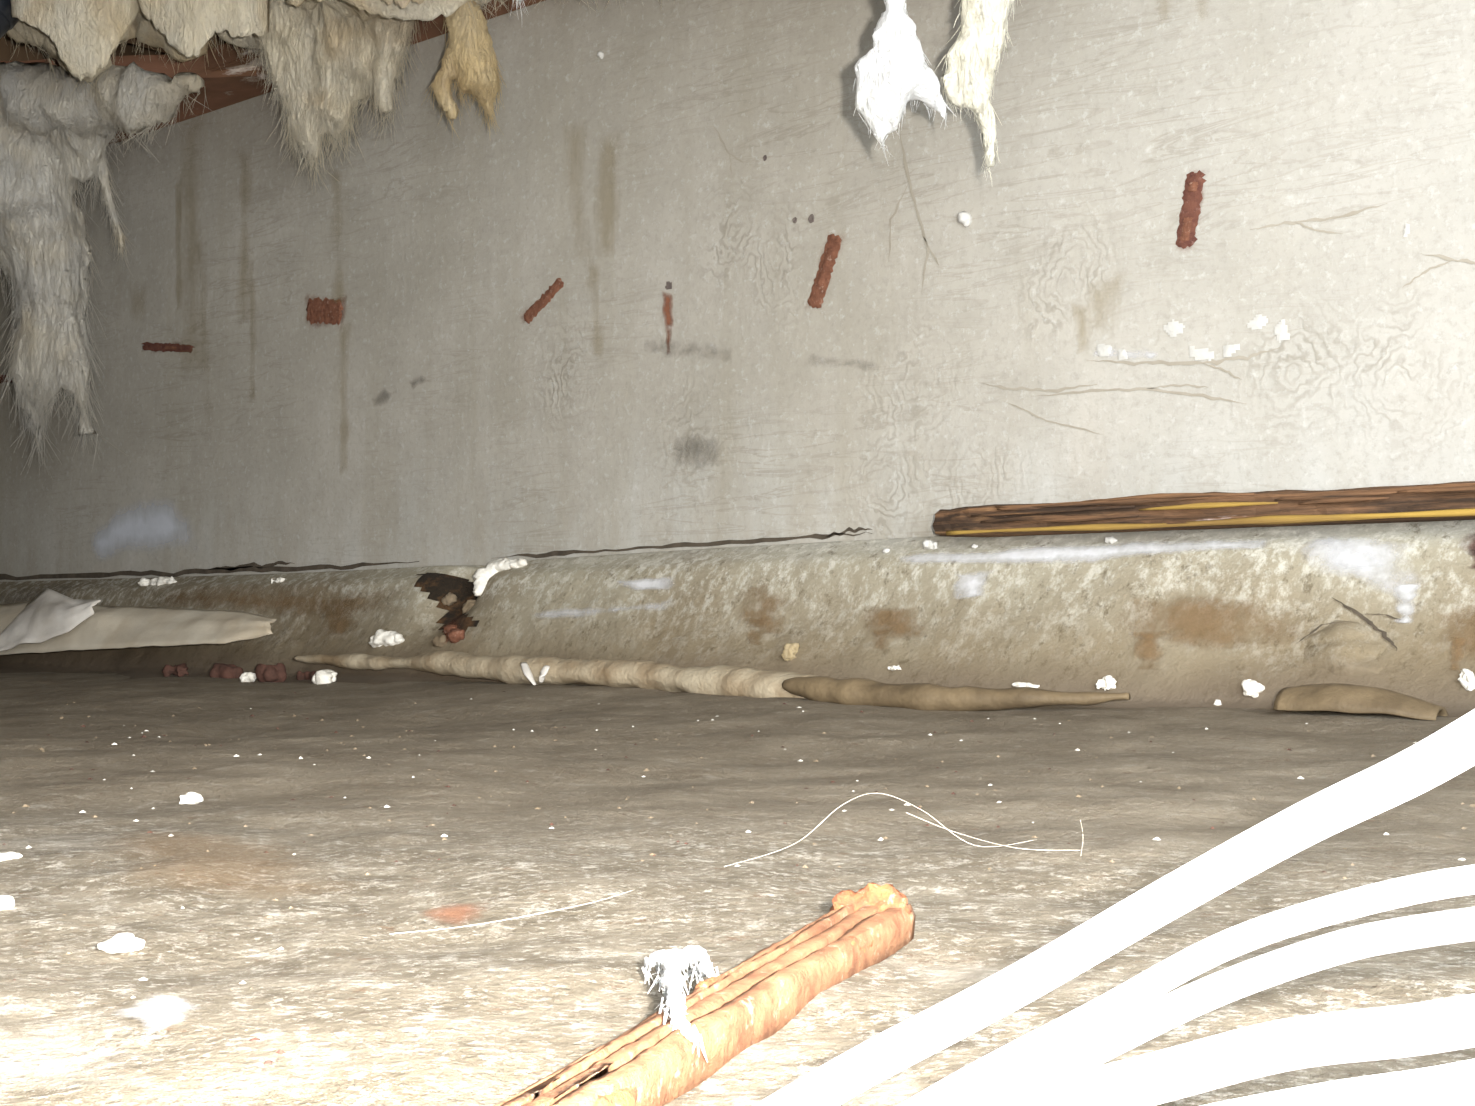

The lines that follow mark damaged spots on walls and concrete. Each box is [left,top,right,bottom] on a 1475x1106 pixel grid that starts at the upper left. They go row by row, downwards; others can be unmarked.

corrosion [1176,170,1207,249]
corrosion [142,342,195,353]
corrosion [306,297,343,325]
corrosion [524,278,564,324]
corrosion [663,281,673,352]
corrosion [807,234,842,309]
crack [500,527,872,558]
spalling [414,573,480,647]